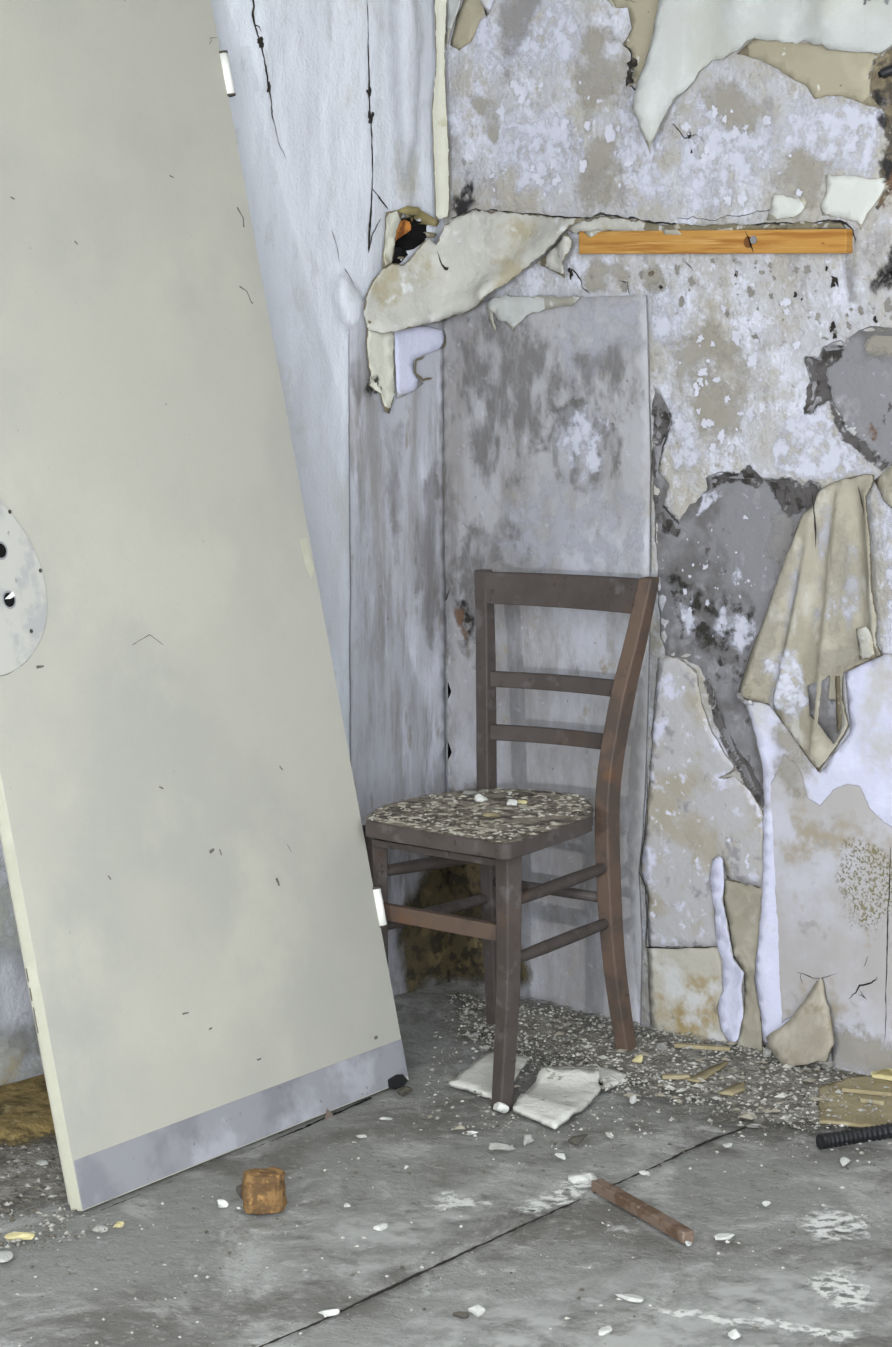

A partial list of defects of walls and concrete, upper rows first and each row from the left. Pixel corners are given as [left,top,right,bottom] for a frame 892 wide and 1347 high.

crack [251,0,285,155]
crack [366,5,388,253]
flaking render [450,0,488,50]
flaking render [607,0,659,87]
flaking render [561,39,892,238]
spalling [392,217,427,264]
spalling [620,264,696,314]
peeling [721,259,839,381]
leakage [549,401,621,482]
spalling [792,297,892,470]
spalling [651,331,820,808]
spalling [632,1043,668,1063]